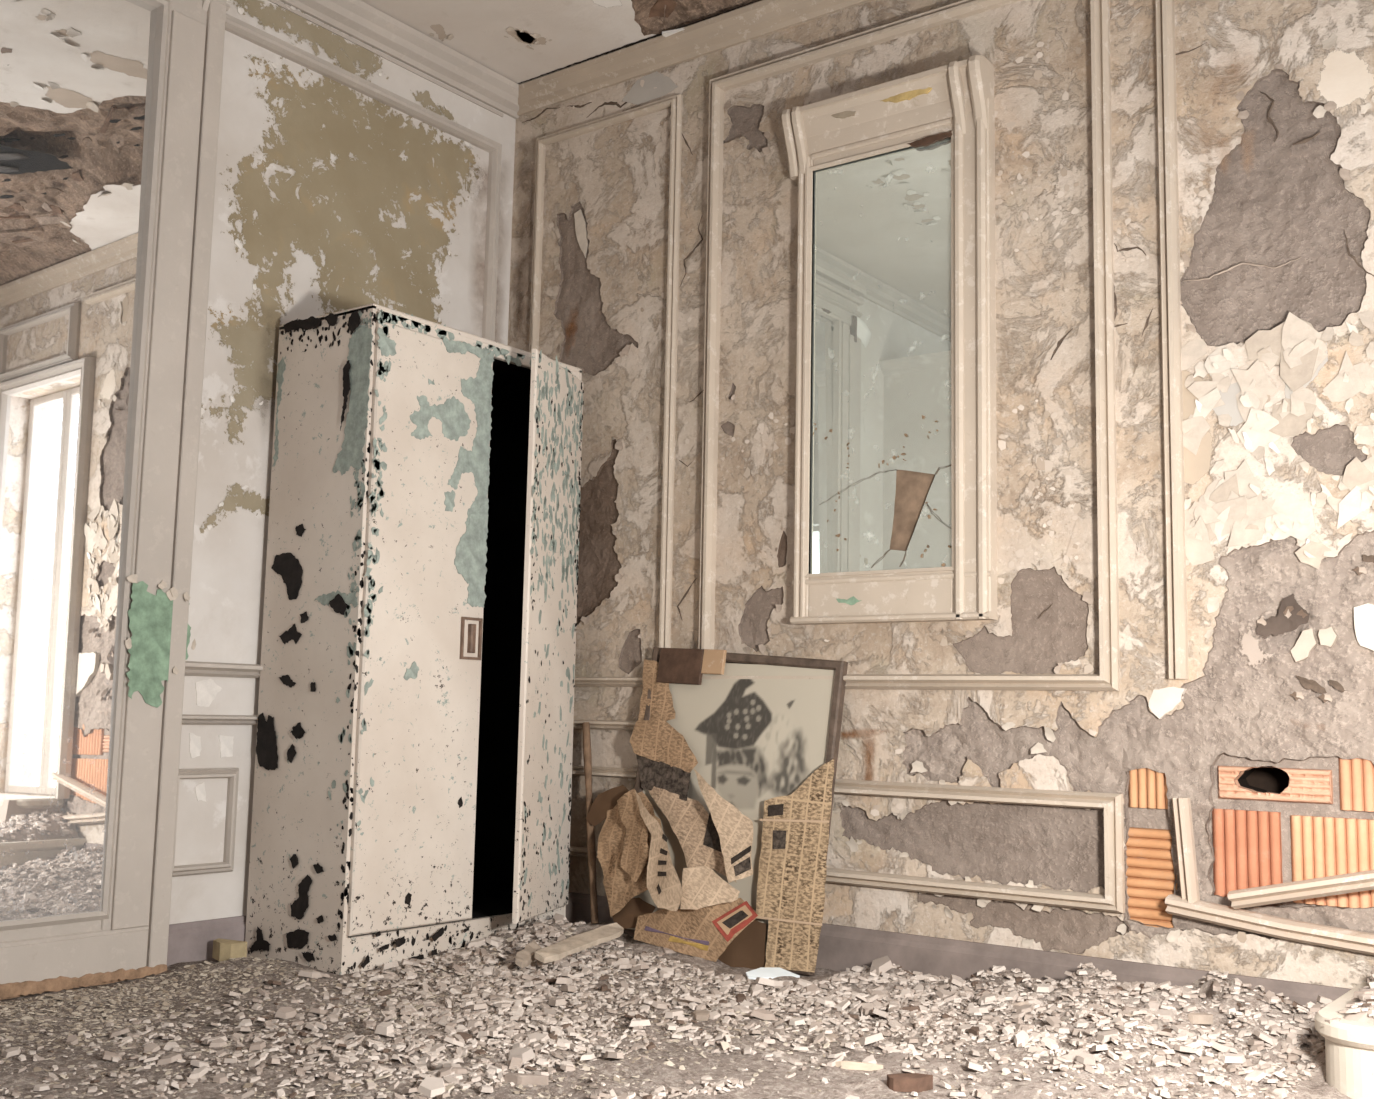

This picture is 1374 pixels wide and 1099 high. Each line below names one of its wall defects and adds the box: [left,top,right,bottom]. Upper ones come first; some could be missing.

flaking render [723,101,771,155]
peeling [201,0,480,445]
flaking render [547,201,666,387]
flaking render [576,417,659,639]
peeling [717,405,795,478]
flaking render [836,34,1374,954]
peeling [125,574,196,708]
peeling [195,679,222,707]